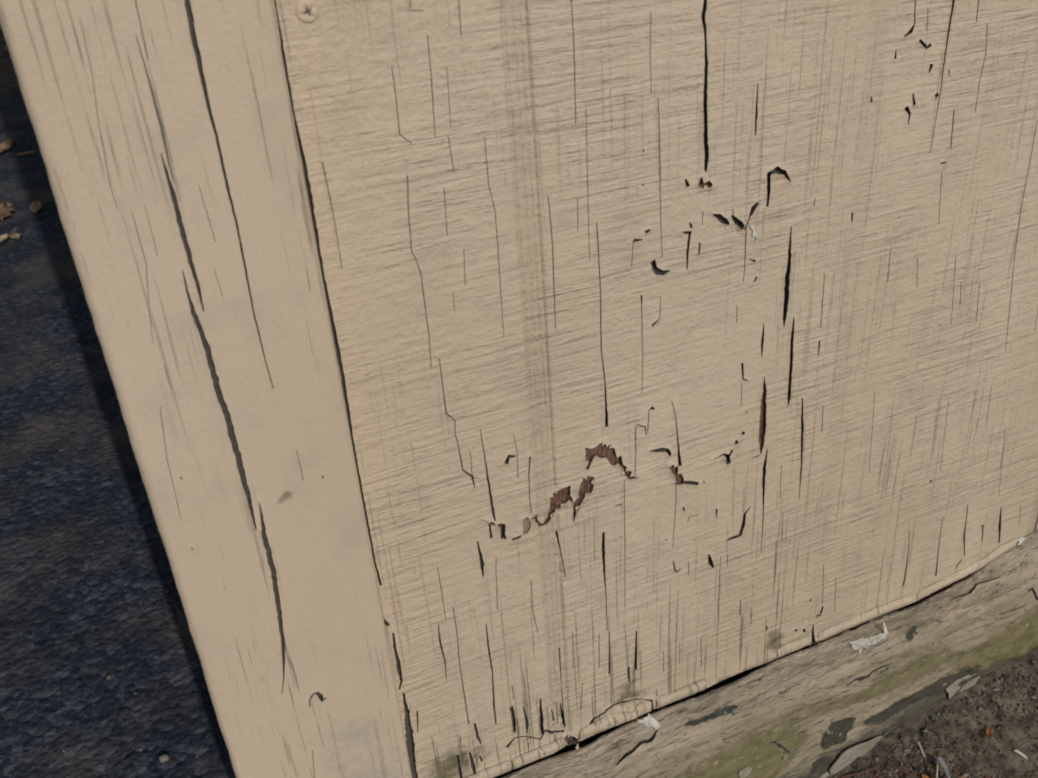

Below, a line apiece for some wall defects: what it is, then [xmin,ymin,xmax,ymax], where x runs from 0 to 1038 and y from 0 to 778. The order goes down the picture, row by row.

crack [135,0,285,691]
crack [274,0,382,586]
crack [384,406,717,778]
peeling [479,430,639,541]
crack [571,0,608,427]
peeling [649,400,705,540]
crack [701,0,709,172]
crack [673,226,825,623]
peeling [820,731,889,778]
water stain [812,665,982,774]
crack [904,0,988,224]
peeling [946,673,980,700]